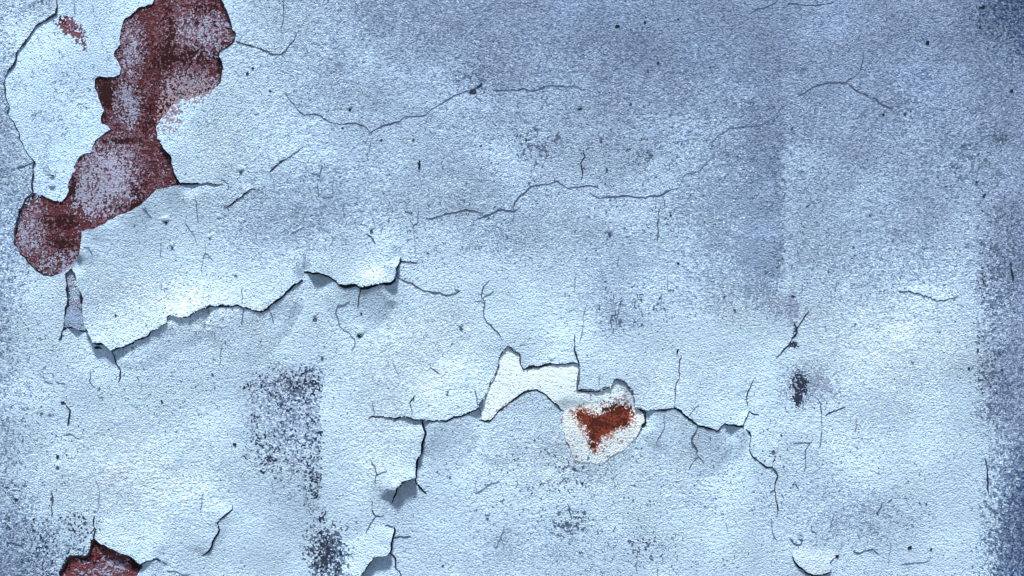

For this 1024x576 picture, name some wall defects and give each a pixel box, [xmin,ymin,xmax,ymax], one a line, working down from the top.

spalling [15,0,235,313]
crack [3,0,891,381]
crack [43,371,95,439]
spalling [60,541,143,576]
corrosion [560,398,636,458]
crack [361,273,857,576]